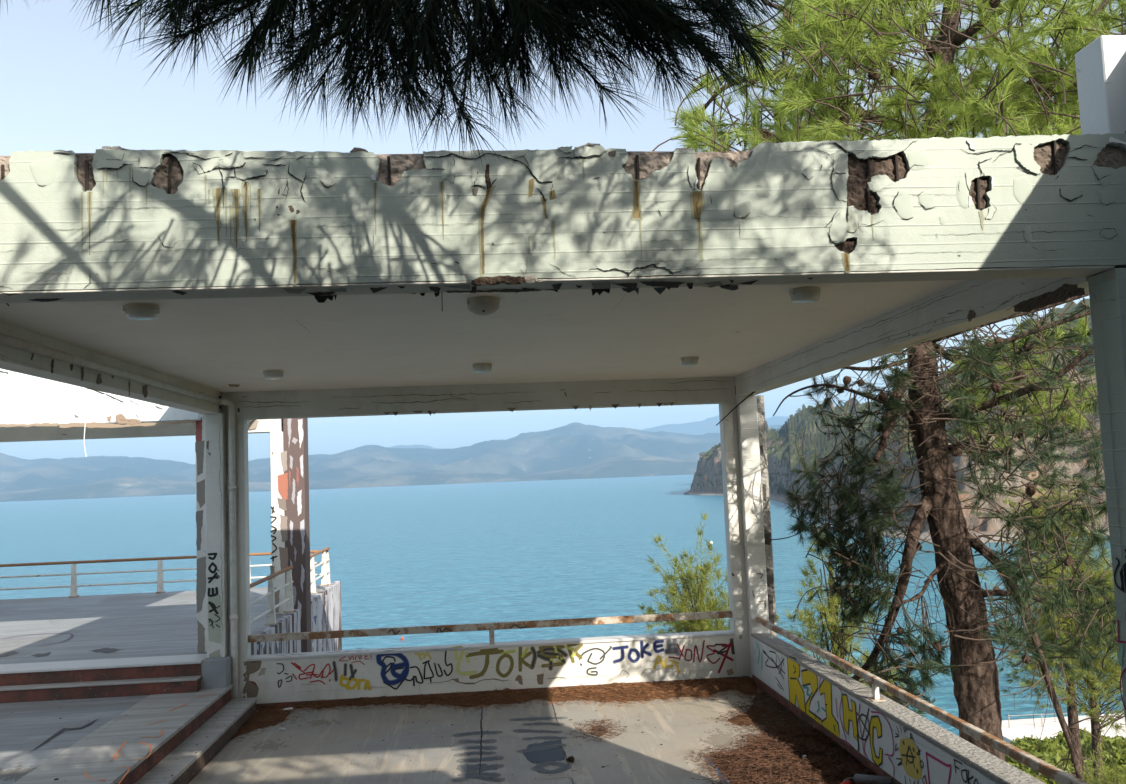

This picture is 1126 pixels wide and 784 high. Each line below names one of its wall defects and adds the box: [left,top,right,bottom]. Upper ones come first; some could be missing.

spalling [76,153,96,192]
corrosion [204,175,262,248]
spalling [371,154,426,186]
corrosion [478,185,496,277]
crack [0,141,1118,289]
spalling [524,145,674,182]
corrosion [690,191,705,262]
spalling [829,142,908,254]
spalling [965,170,996,219]
spalling [1014,140,1067,175]
spalling [370,275,562,297]
spalling [1011,283,1086,316]